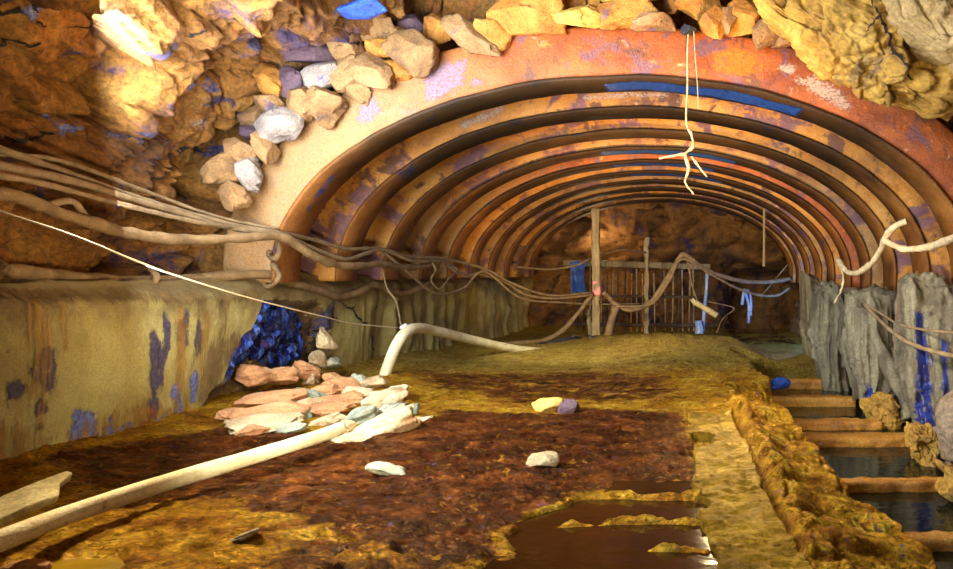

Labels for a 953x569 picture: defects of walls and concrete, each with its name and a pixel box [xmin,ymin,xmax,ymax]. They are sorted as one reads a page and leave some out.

crack [305,300,377,359]